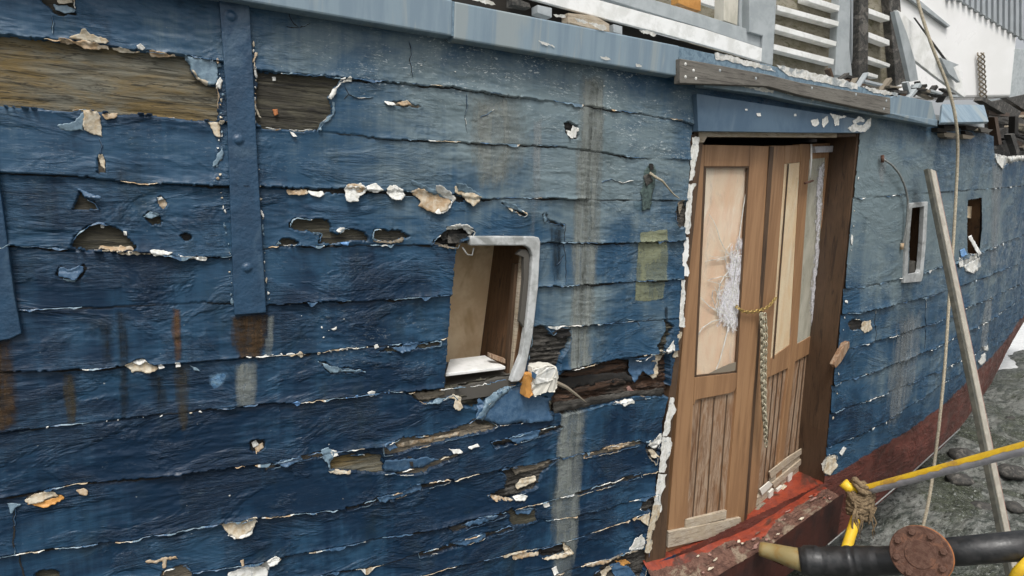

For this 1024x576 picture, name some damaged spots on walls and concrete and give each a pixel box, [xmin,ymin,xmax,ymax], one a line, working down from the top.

peeling [42,0,76,17]
peeling [252,41,352,137]
peeling [0,29,234,305]
rust [233,315,266,358]
peeling [260,136,700,576]